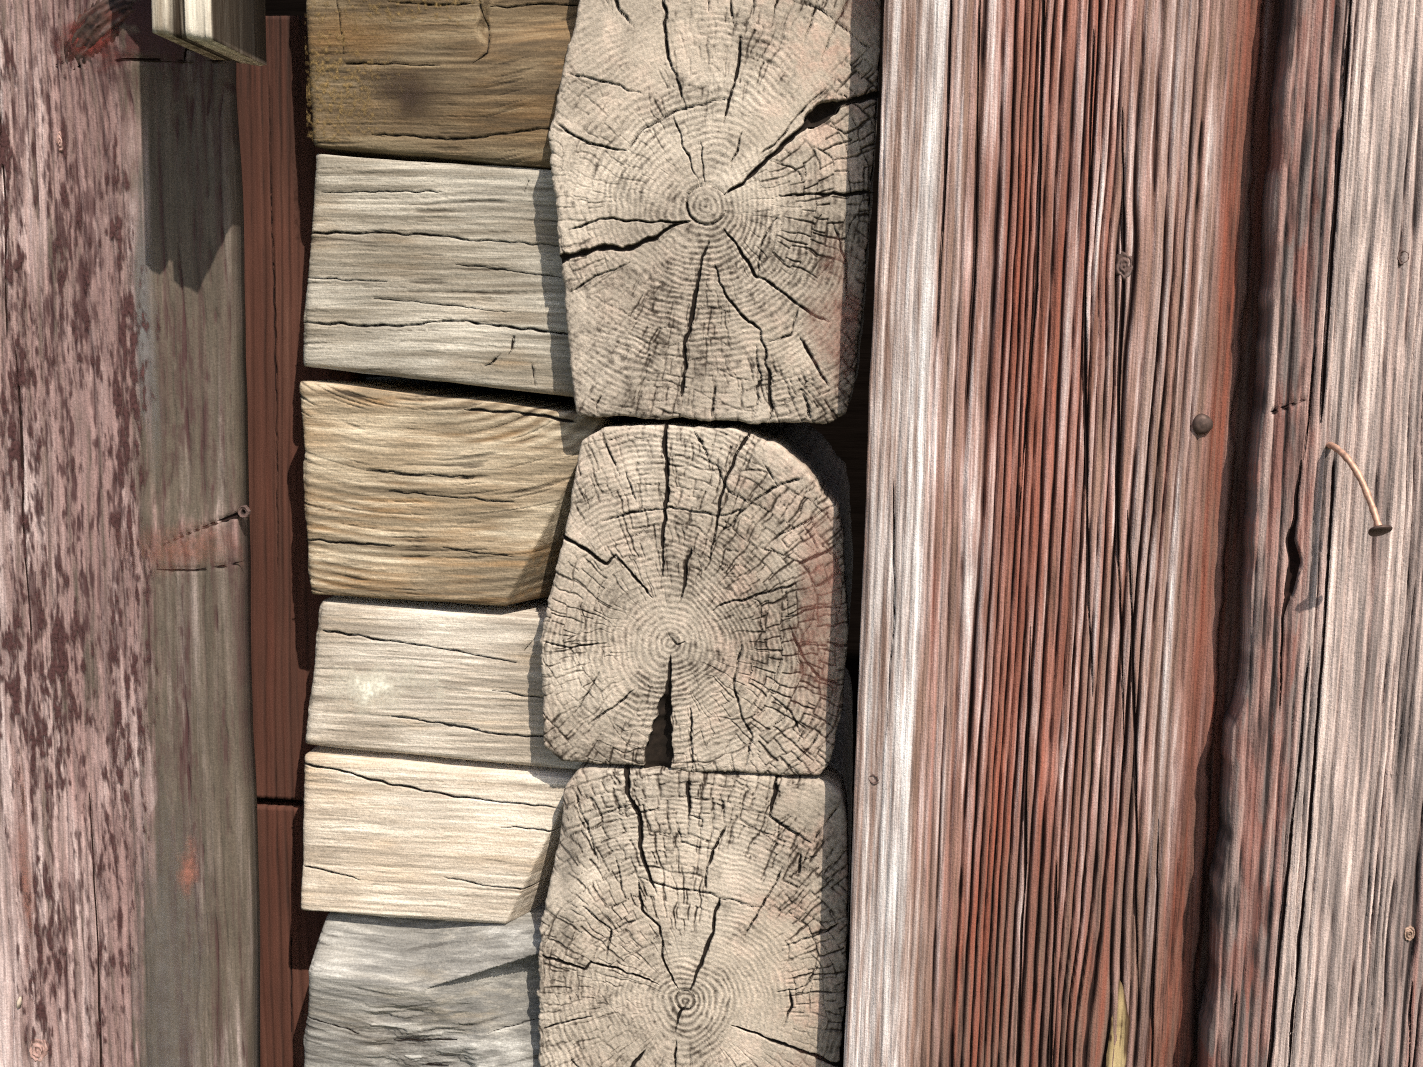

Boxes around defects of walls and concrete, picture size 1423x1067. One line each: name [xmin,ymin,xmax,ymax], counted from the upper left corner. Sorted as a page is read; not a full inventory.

peeling [0,4,160,1062]